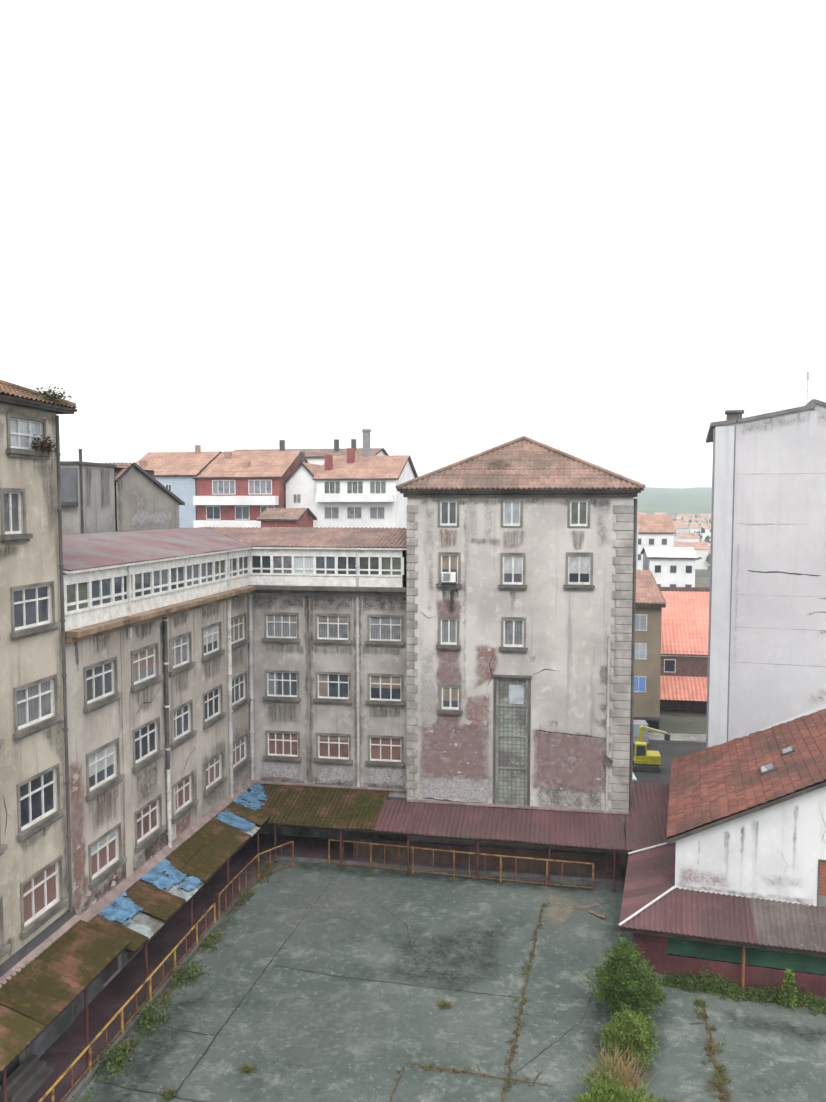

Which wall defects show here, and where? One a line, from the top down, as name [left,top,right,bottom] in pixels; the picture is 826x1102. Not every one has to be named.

peeling [438,601,464,617]
crack [748,570,826,616]
peeling [418,644,496,781]
peeling [533,731,606,792]
crack [97,882,594,1102]